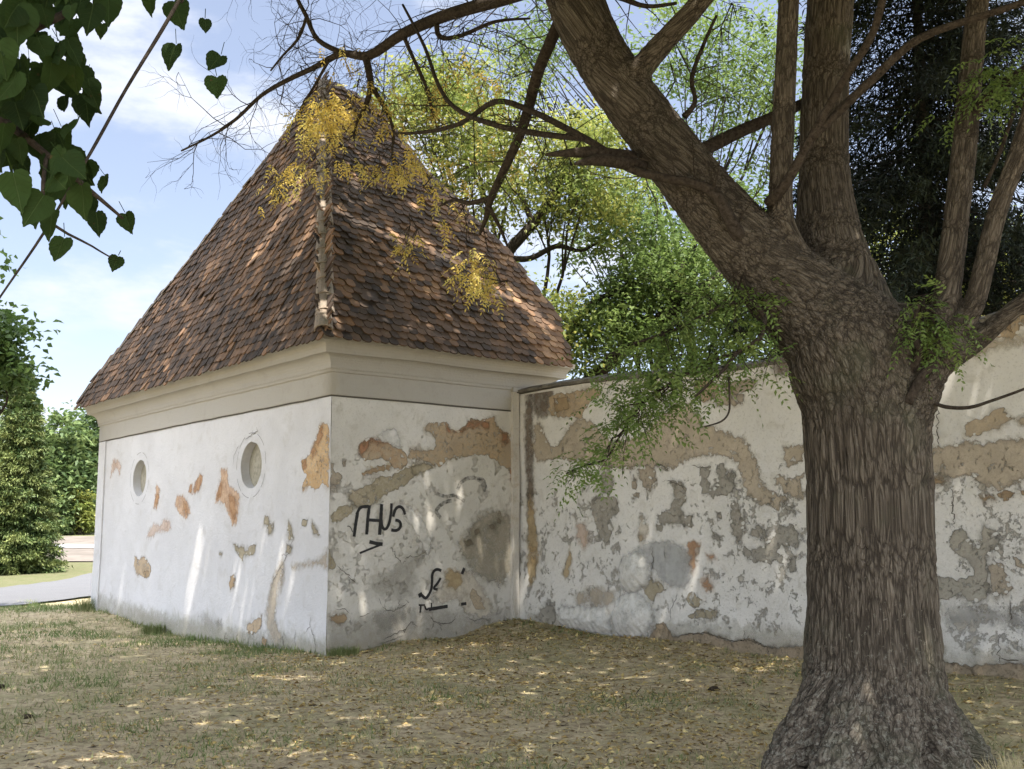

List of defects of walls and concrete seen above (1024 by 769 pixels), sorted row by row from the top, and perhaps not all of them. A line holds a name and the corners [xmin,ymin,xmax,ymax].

flaking render [301,424,346,492]
flaking render [331,416,511,524]
water stain [525,391,553,504]
peeling [532,379,805,573]
peeling [932,407,1024,501]
flaking render [133,557,151,578]
peeling [247,516,320,645]
peeling [641,578,667,604]
peeling [937,526,1024,602]